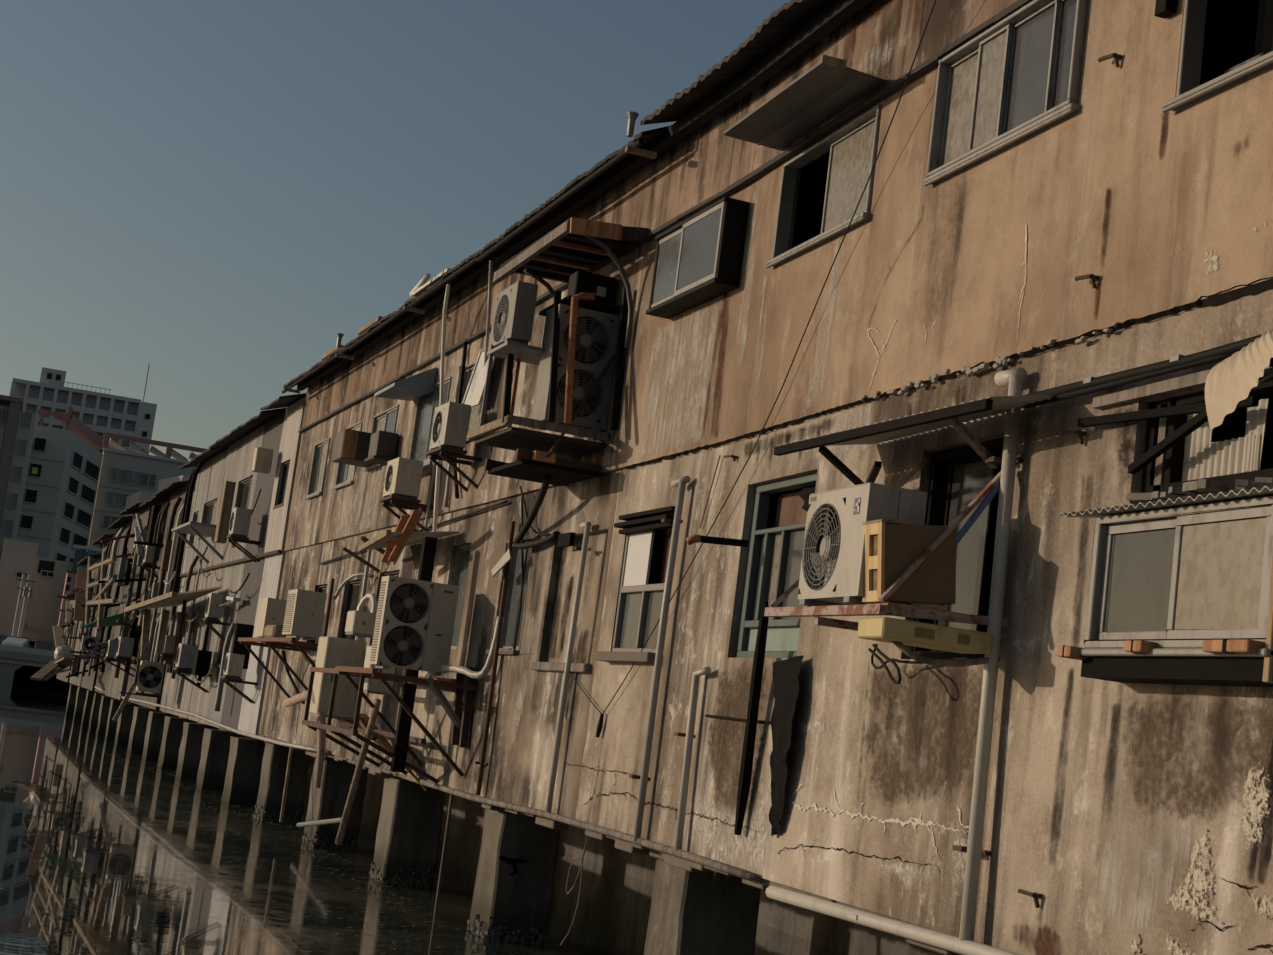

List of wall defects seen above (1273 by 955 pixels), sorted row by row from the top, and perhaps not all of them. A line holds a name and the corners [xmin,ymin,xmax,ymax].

corrosion [1101,189,1110,255]
leakage [1108,697,1273,883]
spalling [1240,762,1271,849]
leakage [1101,835,1191,929]
spalling [1166,934,1201,955]
spalling [1166,829,1223,924]
crack [1190,878,1273,953]
spalling [1250,894,1273,921]